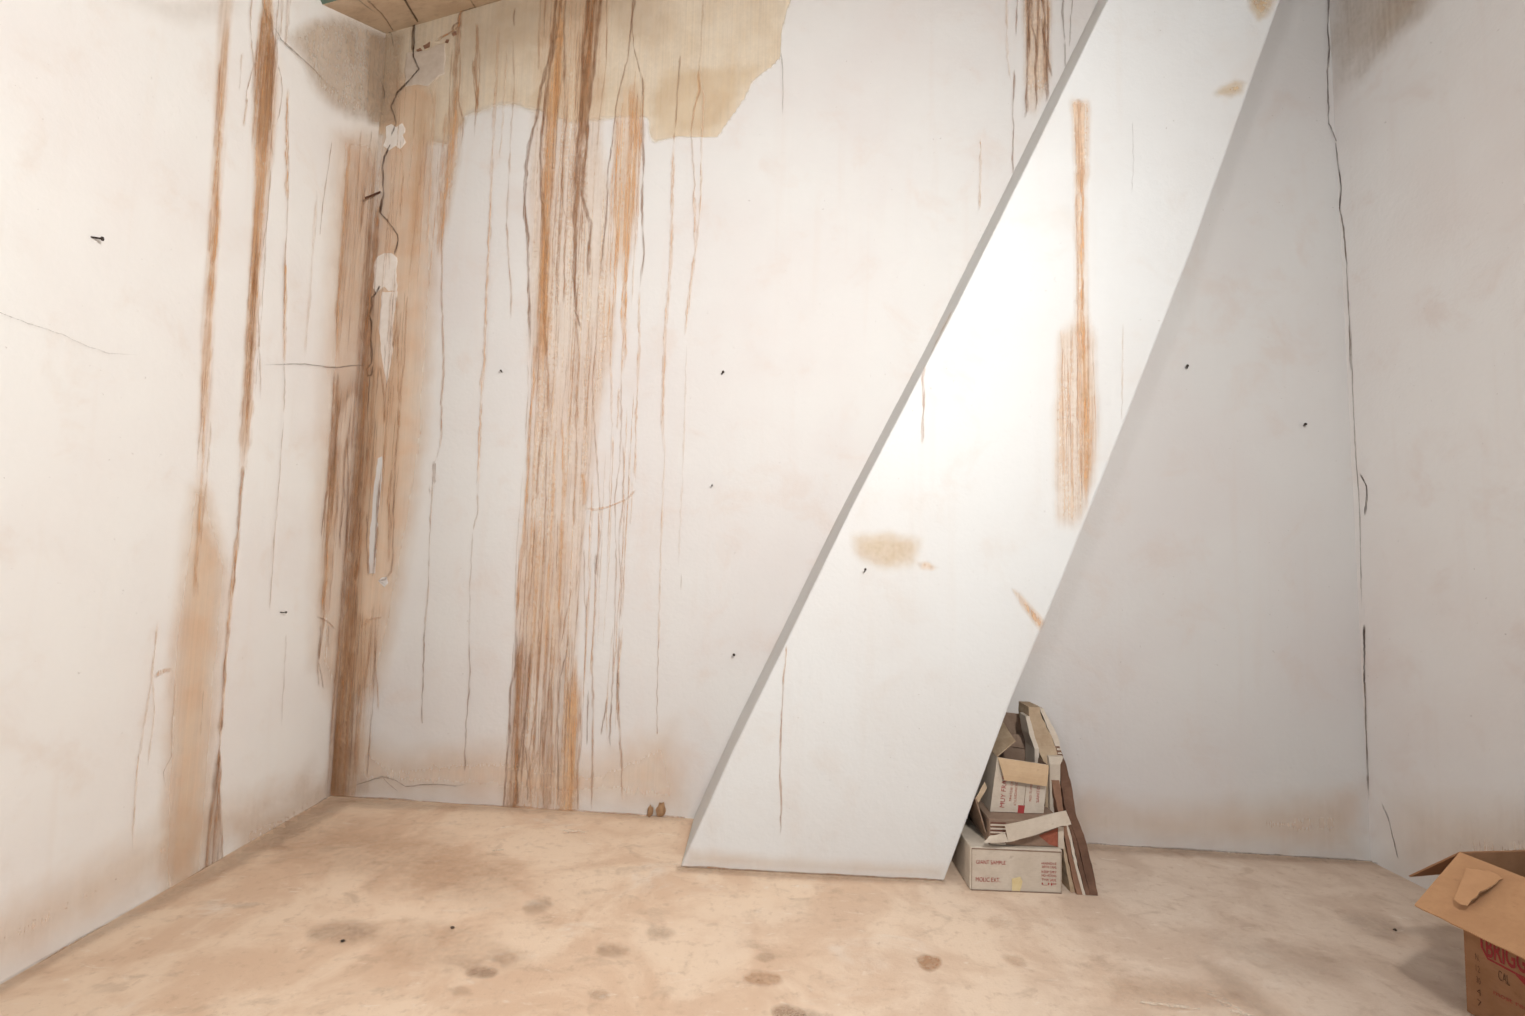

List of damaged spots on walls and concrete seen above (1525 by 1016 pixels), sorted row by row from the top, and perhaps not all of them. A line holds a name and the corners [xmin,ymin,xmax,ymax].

rust [248,1,289,353]
crack [370,0,495,254]
rust [523,0,645,350]
damp [379,0,790,142]
rust [1013,0,1064,107]
rust [1074,103,1084,262]
crack [1327,1,1353,375]
crack [281,287,379,402]
rust [319,38,479,797]
rust [173,471,244,884]
crack [1089,627,1397,862]
damp [919,956,940,969]